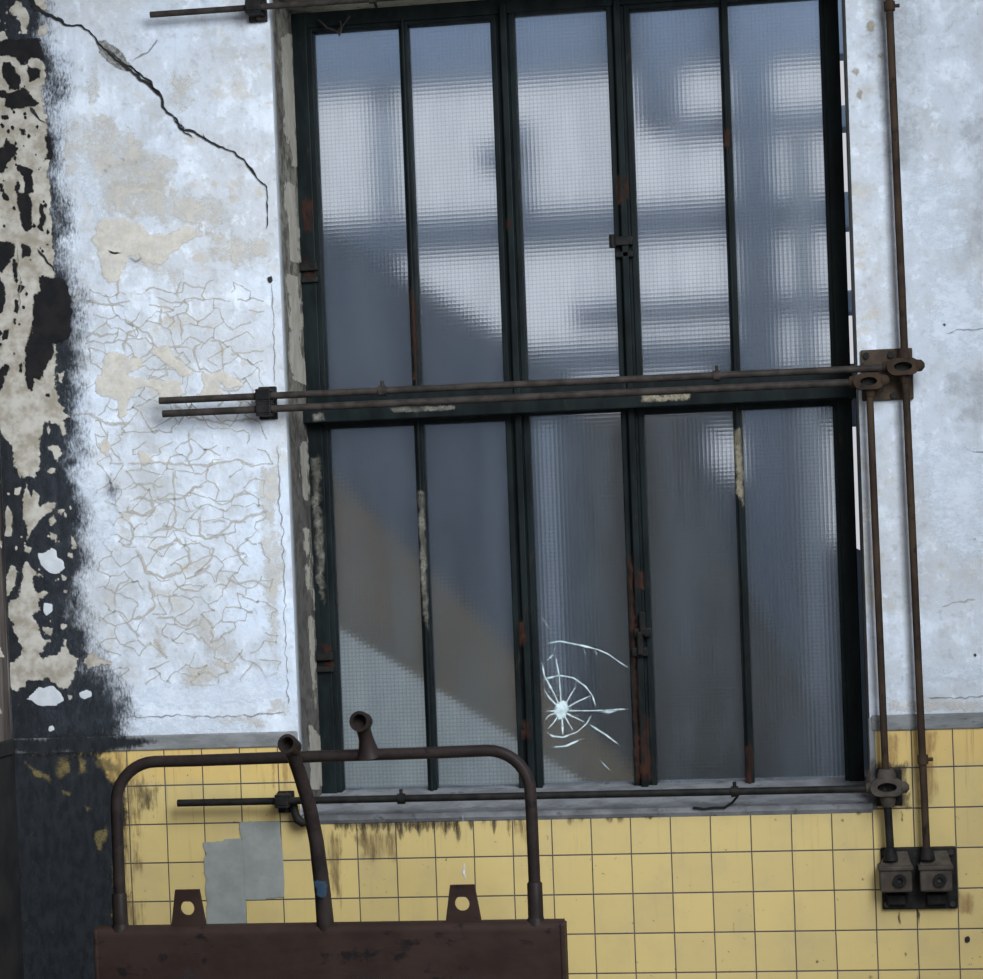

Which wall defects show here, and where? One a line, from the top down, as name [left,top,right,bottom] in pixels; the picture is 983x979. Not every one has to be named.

crack [30,0,268,226]
peeling [92,177,268,283]
peeling [0,0,112,706]
peeling [96,345,243,418]
damp [928,277,983,359]
crack [79,279,289,718]
damp [924,441,983,558]
peeling [203,821,284,924]
damp [337,820,473,858]